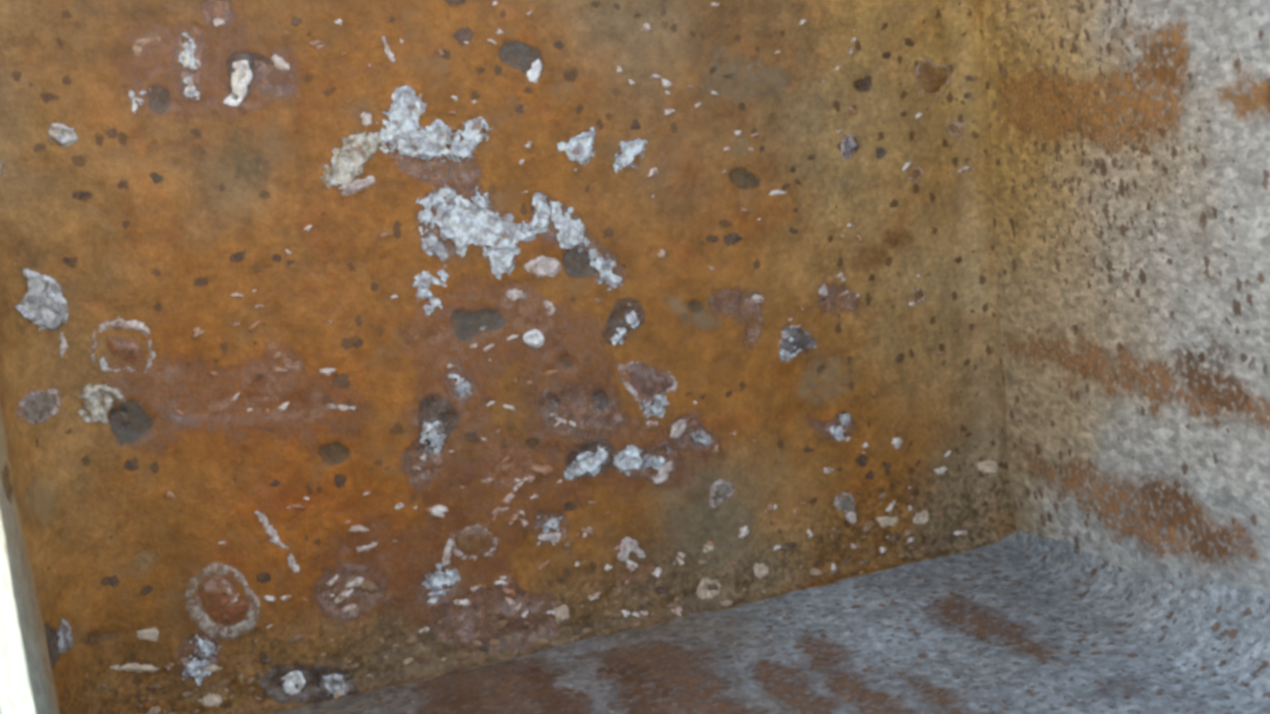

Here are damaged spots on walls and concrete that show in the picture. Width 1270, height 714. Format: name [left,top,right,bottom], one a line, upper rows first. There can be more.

peeling [223,52,295,106]
corrosion [1004,25,1188,149]
corrosion [1220,75,1270,117]
peeling [320,86,647,349]
peeling [14,268,69,332]
peeling [401,361,479,486]
peeling [537,383,717,484]
corrosion [1008,338,1270,428]
corrosion [1026,453,1257,559]
corrosion [929,598,1052,662]
peeling [261,664,357,703]
corrosion [754,637,912,714]